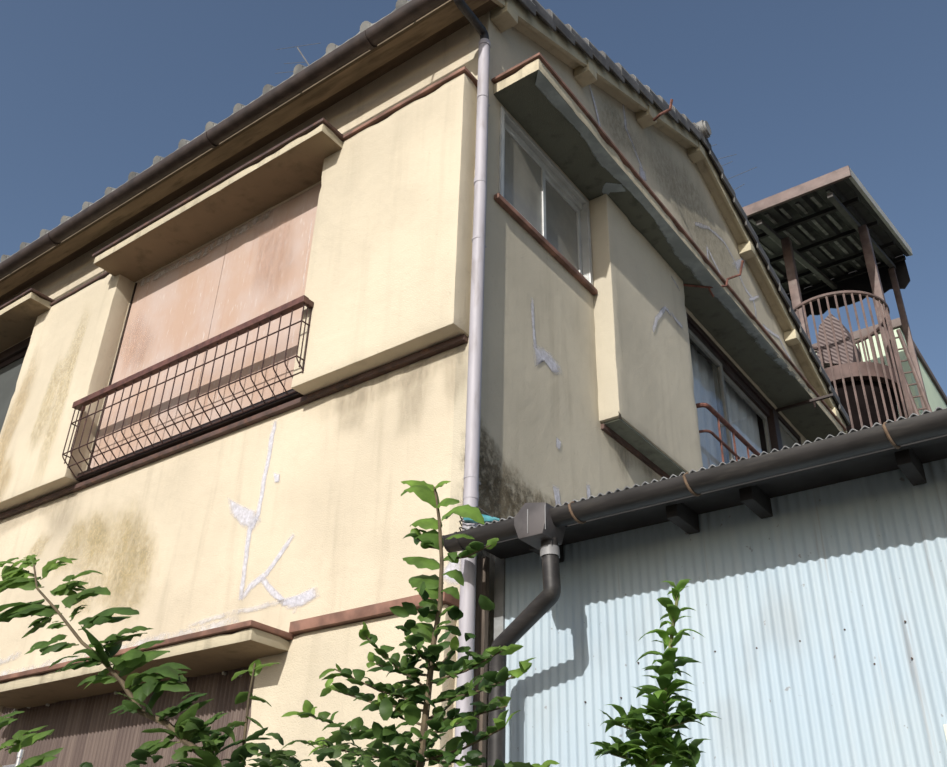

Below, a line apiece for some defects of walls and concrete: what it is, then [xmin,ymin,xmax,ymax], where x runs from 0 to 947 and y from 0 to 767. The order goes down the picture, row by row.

crack [531,301,558,372]
crack [695,222,791,359]
crack [230,423,315,607]
damp [478,429,552,525]